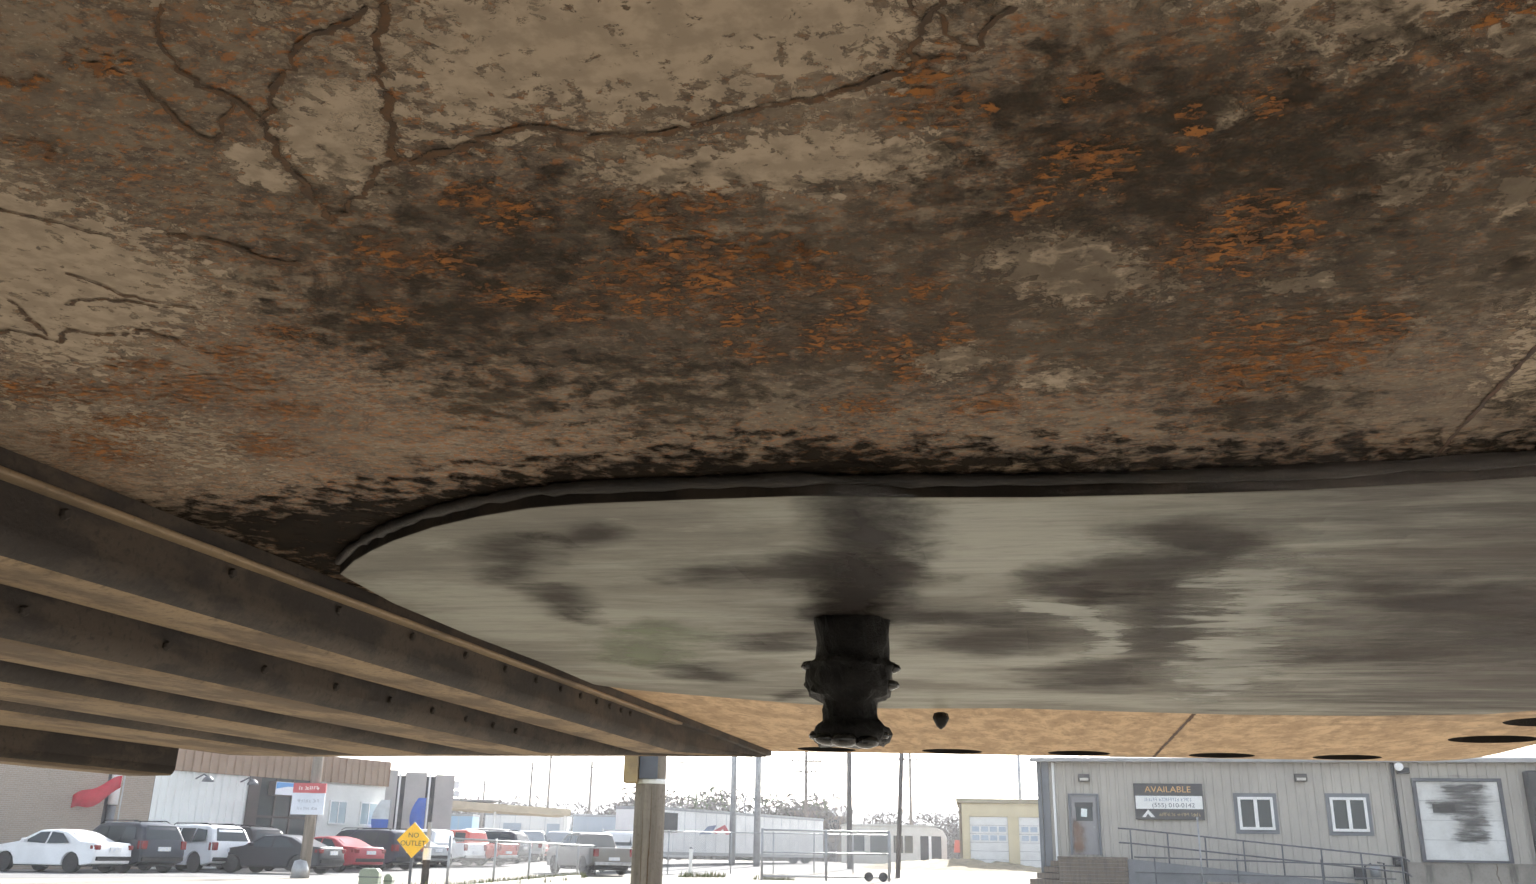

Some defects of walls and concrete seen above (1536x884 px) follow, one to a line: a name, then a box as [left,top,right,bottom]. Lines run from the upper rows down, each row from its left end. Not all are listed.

crack [0,209,102,235]
crack [0,273,198,347]
crack [138,0,1018,224]
peeling [170,0,1536,223]
peeling [950,217,1204,316]
corrosion [1004,128,1151,222]
corrosion [1169,103,1214,157]
corrosion [1148,187,1336,280]
peeling [1255,265,1340,299]
leakage [140,165,1536,596]
peeling [901,339,1108,395]
leakage [904,523,1536,702]